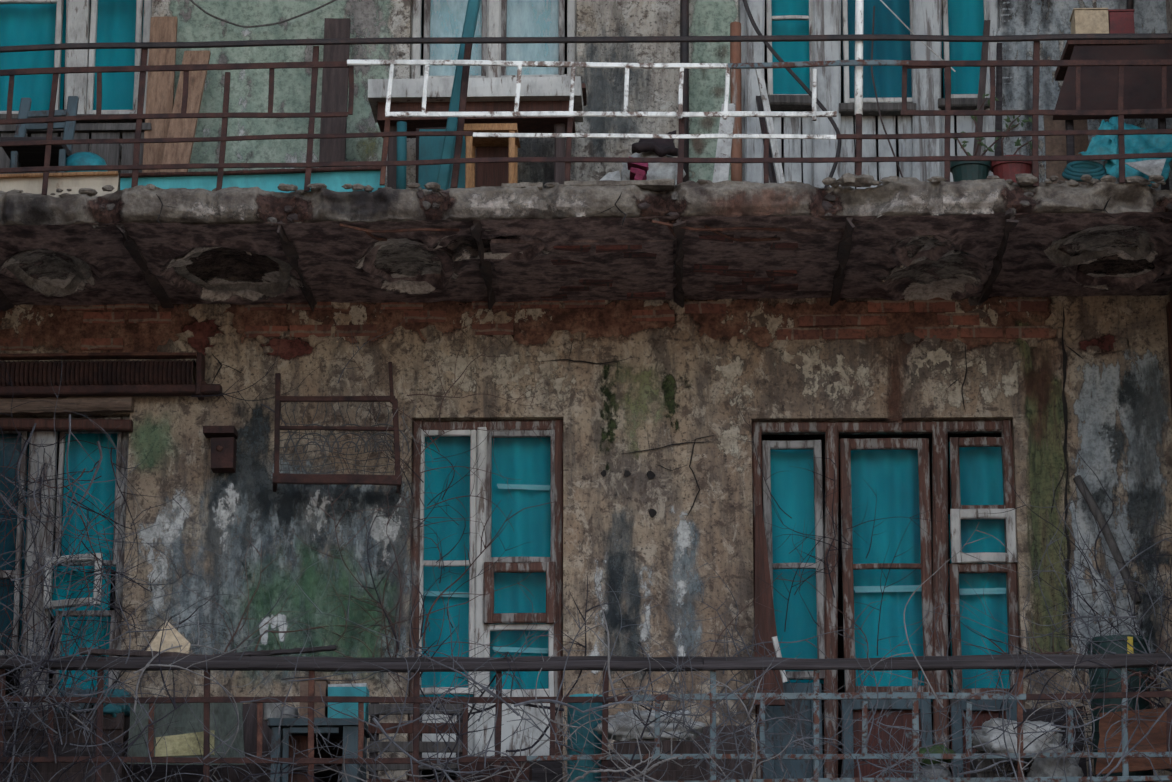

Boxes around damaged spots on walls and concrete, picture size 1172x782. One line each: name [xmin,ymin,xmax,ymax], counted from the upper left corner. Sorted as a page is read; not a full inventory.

peeling [189,202,298,225]
peeling [468,192,586,217]
spalling [0,223,1079,471]
damp [137,403,412,678]
damp [590,511,652,657]
damp [1127,365,1169,649]